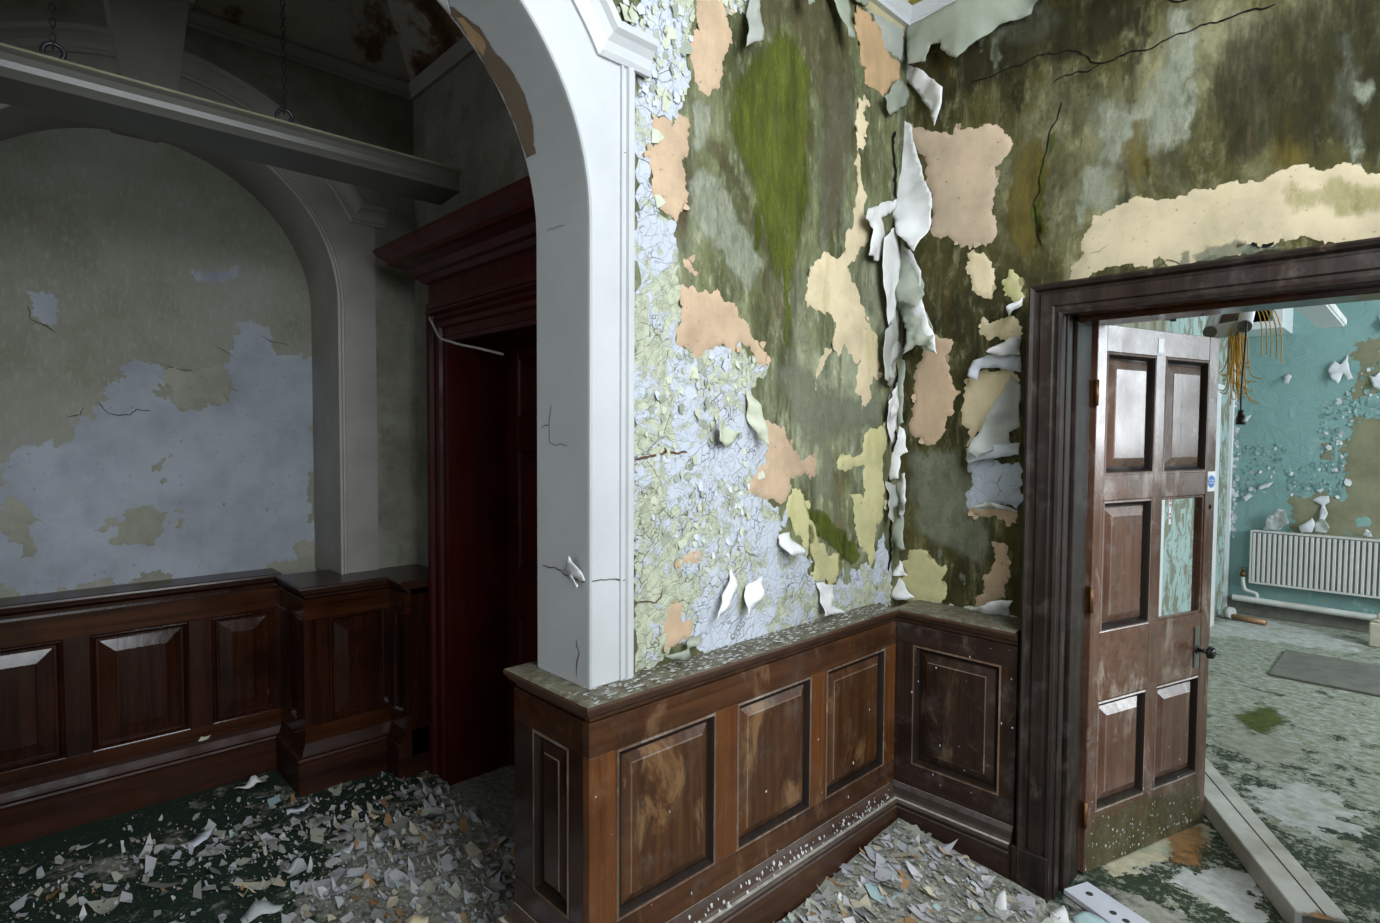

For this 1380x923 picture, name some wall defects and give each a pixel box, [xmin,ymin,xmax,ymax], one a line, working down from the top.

peeling [0,320,315,596]
leakage [693,100,711,150]
leakage [690,168,765,292]
peeling [617,0,1039,672]
leakage [780,269,881,506]
leakage [954,0,1146,110]
crack [971,0,1275,245]
leakage [1076,9,1198,223]
leakage [1181,241,1263,264]
flaking render [1070,162,1380,280]
leakage [1219,0,1380,166]
flaking render [1230,316,1380,539]